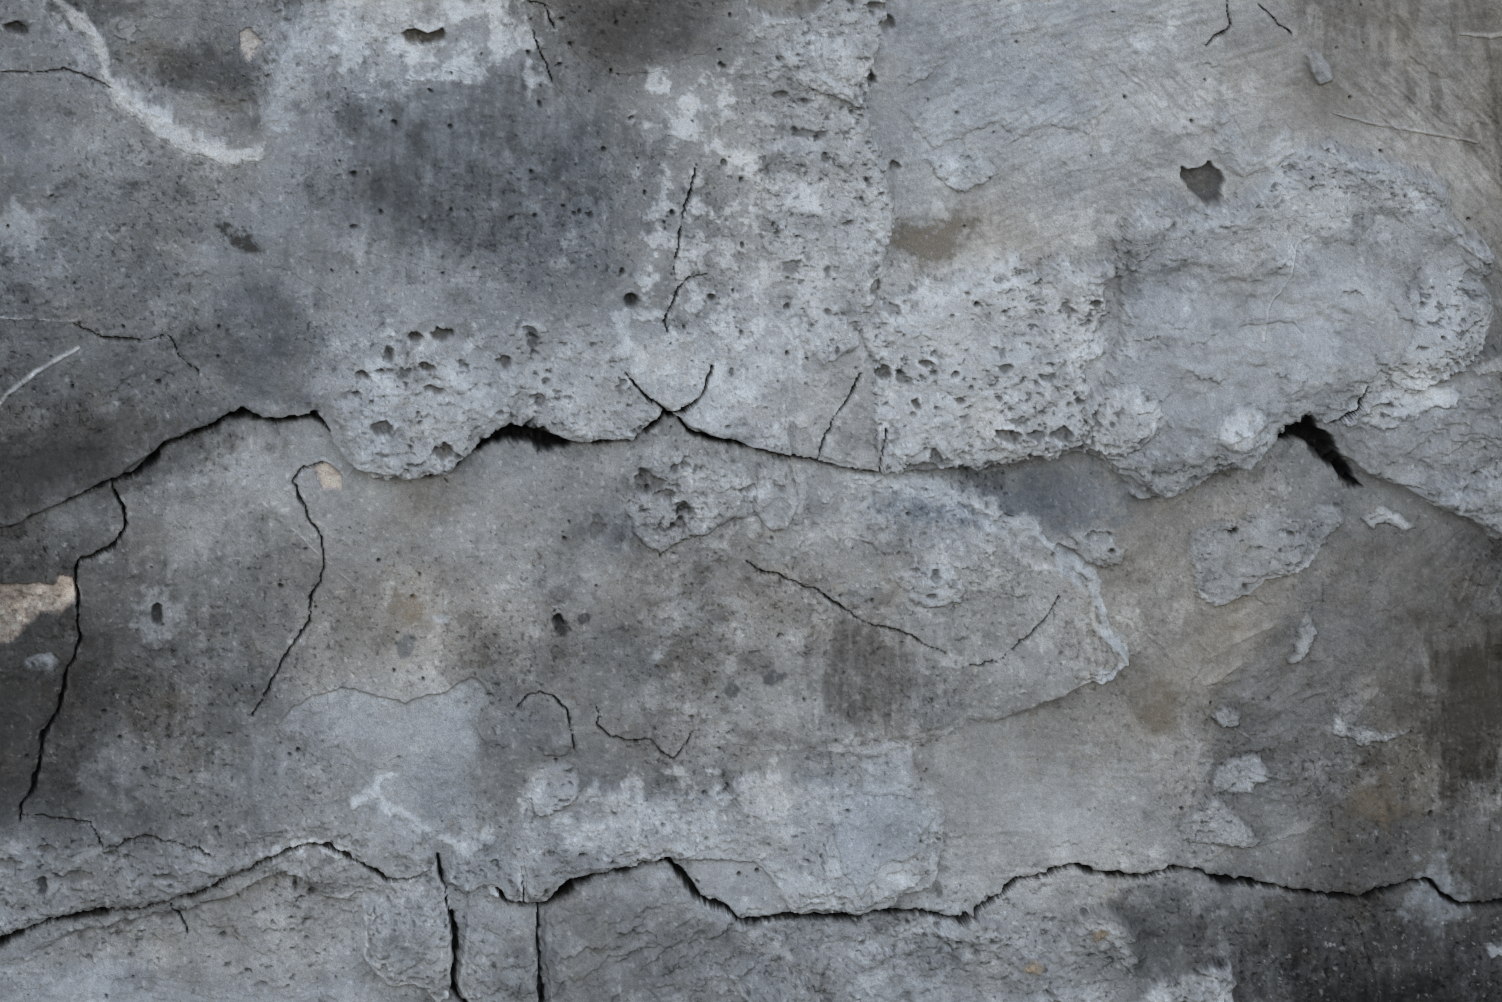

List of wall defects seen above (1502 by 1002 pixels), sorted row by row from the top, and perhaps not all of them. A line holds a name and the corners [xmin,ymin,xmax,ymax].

spalling [52,0,303,169]
crack [662,165,709,345]
crack [421,365,889,478]
flaking render [329,0,1502,1002]
crack [1277,385,1371,490]
spalling [0,574,76,645]
spalling [23,651,62,672]
crack [0,406,467,1002]
crack [517,690,694,761]
crack [745,560,1062,669]
spalling [0,677,496,1002]
crack [496,857,1502,1002]